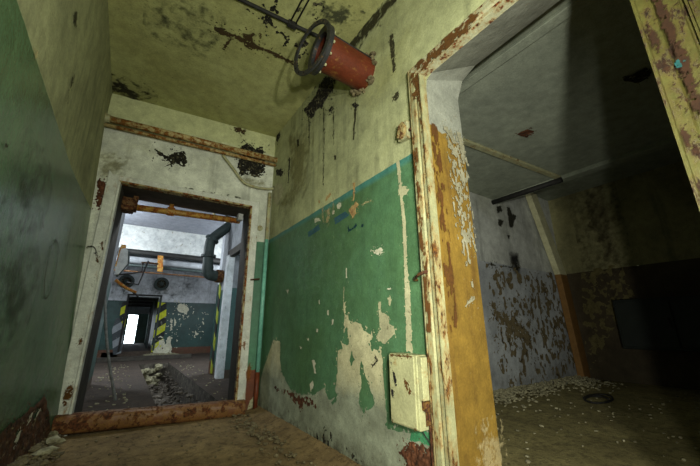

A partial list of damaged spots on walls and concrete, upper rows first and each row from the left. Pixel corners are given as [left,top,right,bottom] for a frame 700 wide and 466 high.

damp [111,73,154,101]
damp [210,0,309,66]
rust [646,0,700,155]
peeling [332,182,359,218]
rust [413,123,458,332]
peeling [440,120,477,266]
peeling [247,288,431,466]
peeling [486,264,575,387]